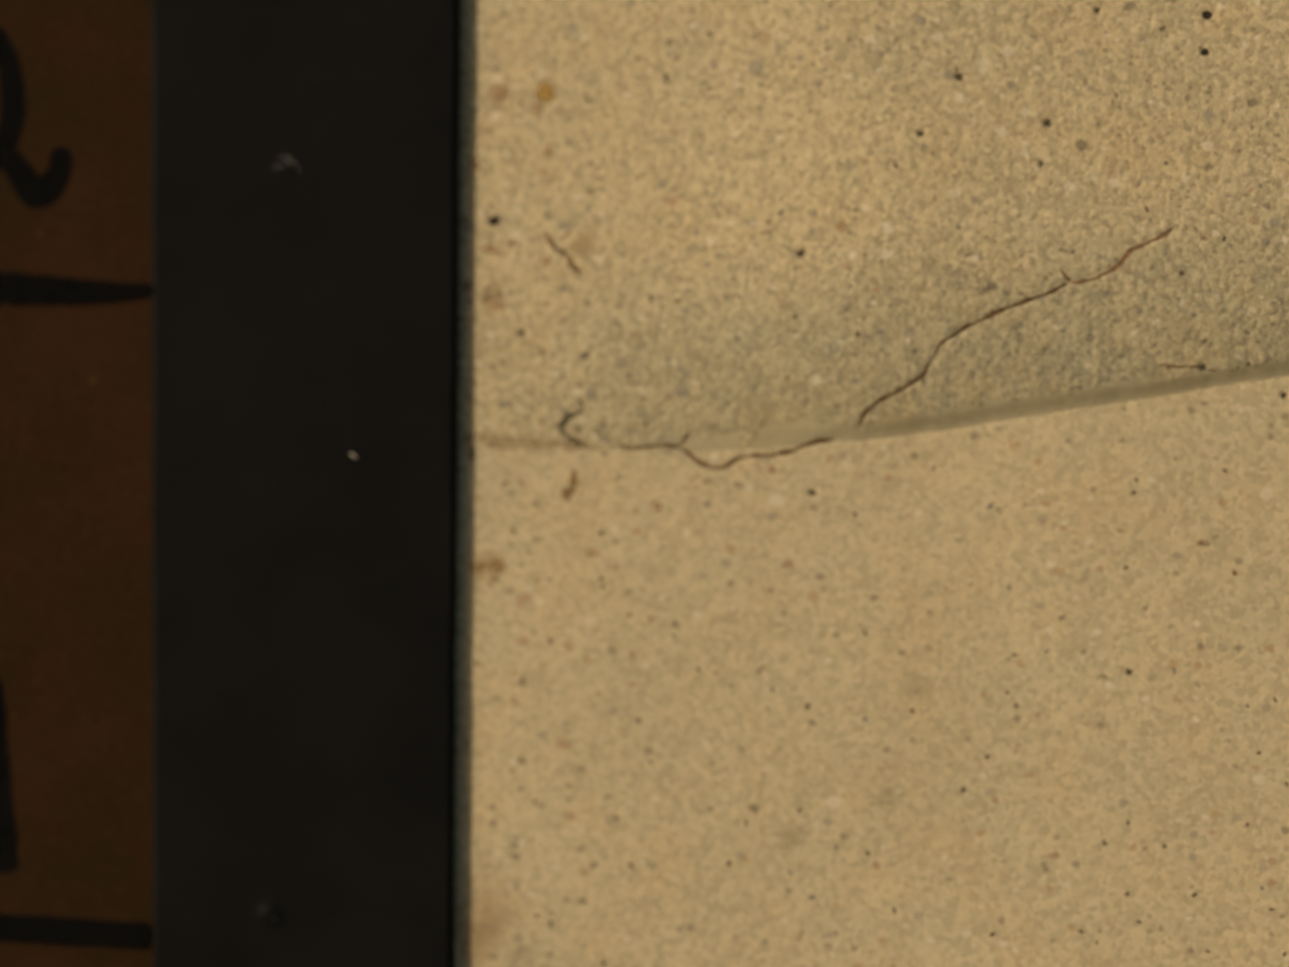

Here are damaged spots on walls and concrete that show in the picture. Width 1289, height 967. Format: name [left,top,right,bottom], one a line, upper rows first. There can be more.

crack [544,232,581,274]
crack [618,227,1174,470]
crack [558,400,584,448]